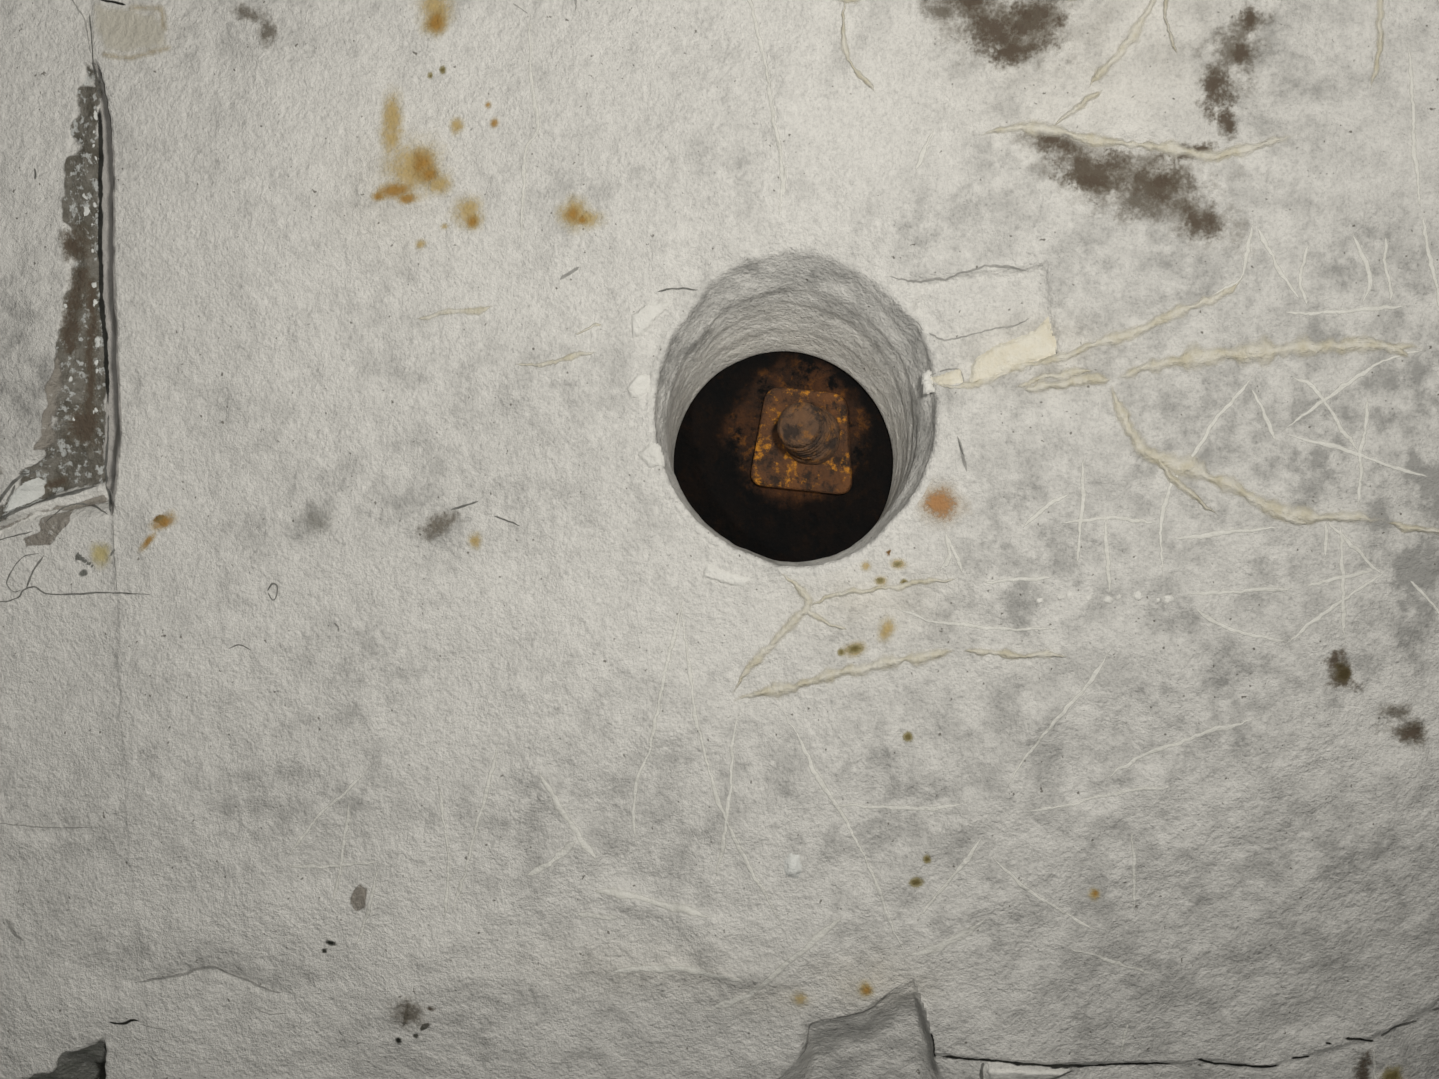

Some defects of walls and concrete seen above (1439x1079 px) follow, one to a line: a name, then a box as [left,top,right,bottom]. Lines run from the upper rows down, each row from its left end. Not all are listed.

rust [423,0,448,32]
damp [929,0,1067,65]
damp [1202,7,1271,138]
rust [374,99,449,203]
rust [460,201,479,227]
damp [1037,133,1221,239]
spalling [0,64,122,546]
crack [931,1008,1439,1079]